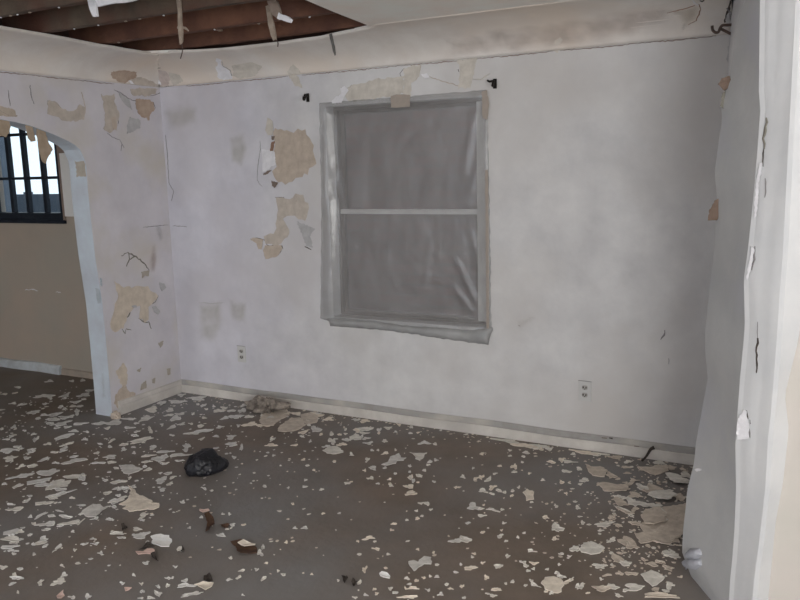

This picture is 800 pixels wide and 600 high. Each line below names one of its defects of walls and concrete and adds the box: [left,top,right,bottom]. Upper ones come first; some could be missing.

peeling [0,106,17,137]
peeling [47,92,86,122]
peeling [101,70,183,134]
peeling [332,65,429,103]
peeling [25,125,53,164]
peeling [250,118,316,259]
peeling [708,199,719,220]
crack [121,252,149,278]
peeling [110,281,166,333]
crack [753,322,761,373]
peeling [114,363,155,408]
peeling [736,409,751,440]